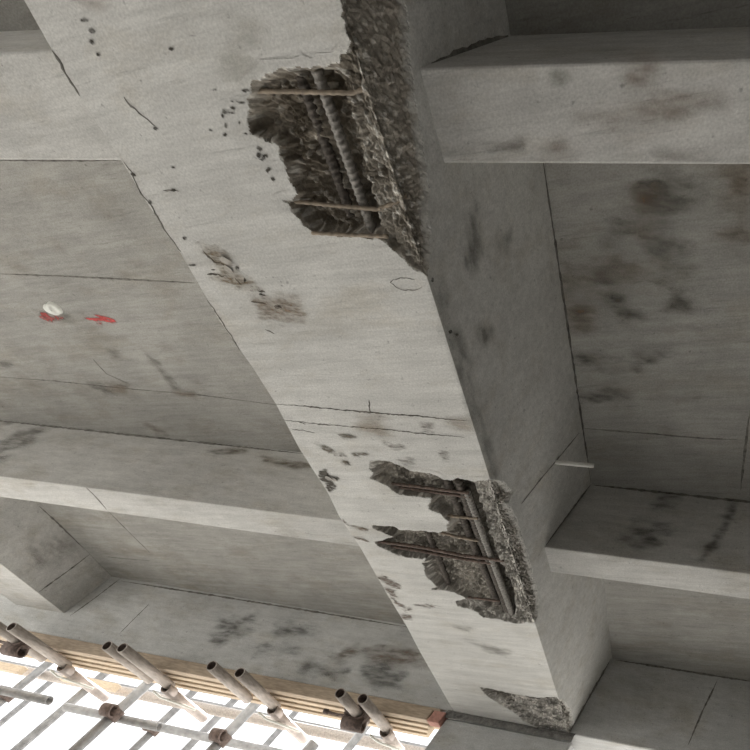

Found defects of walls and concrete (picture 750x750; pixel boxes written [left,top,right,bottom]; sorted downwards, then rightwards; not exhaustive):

crack [52,51,80,96]
spalling [221,0,437,283]
crack [277,401,464,438]
spalling [322,445,543,627]
spalling [476,685,575,733]